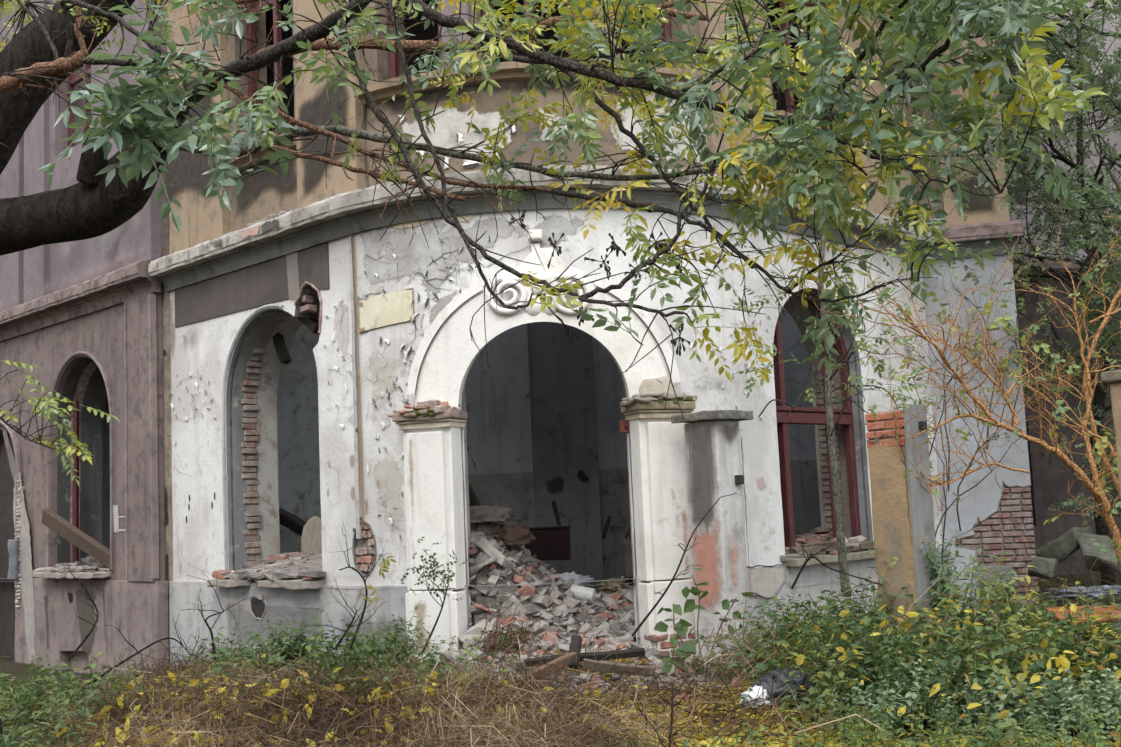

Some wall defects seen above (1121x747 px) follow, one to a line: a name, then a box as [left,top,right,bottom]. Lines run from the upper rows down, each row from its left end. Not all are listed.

peeling [294,214,584,577]
water stain [683,427,737,607]
water stain [725,424,737,441]
flaking render [954,475,1039,593]